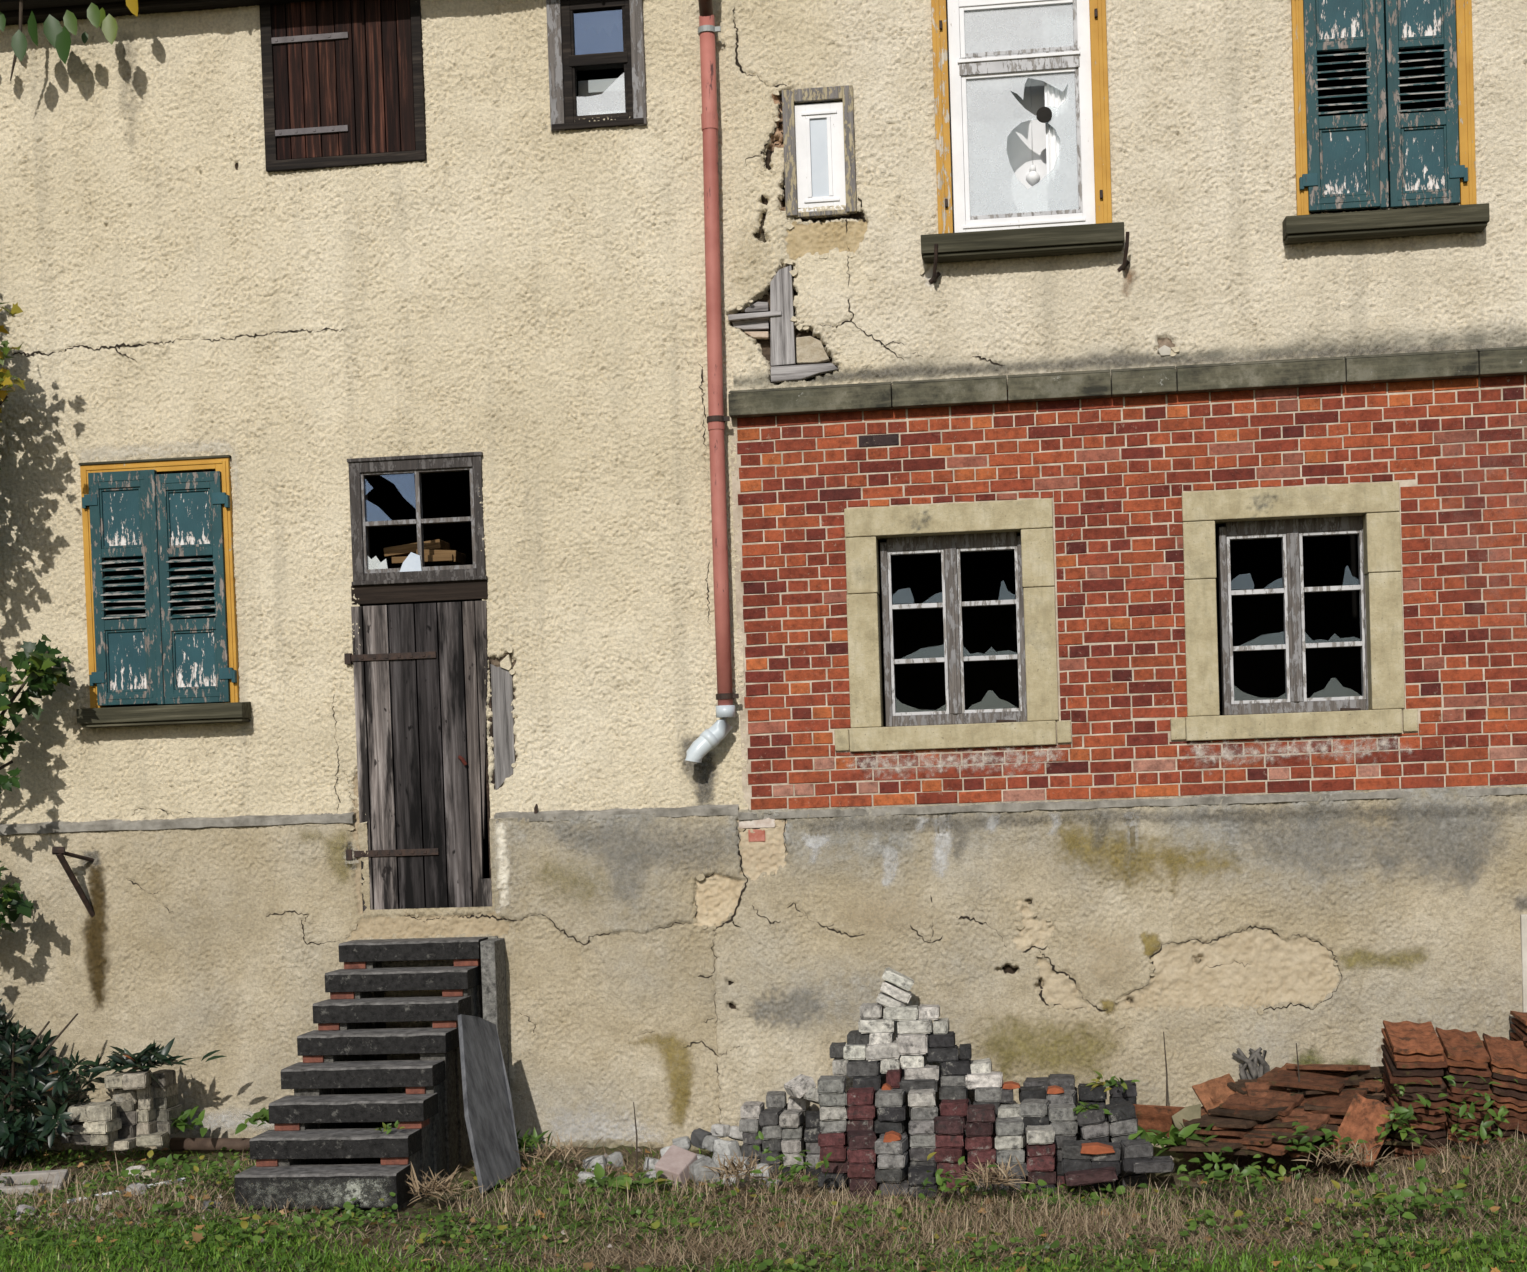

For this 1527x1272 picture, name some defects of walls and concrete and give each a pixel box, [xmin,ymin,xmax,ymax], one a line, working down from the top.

crack [732,8,787,166]
peeling [768,90,784,151]
spalling [728,186,868,385]
crack [9,327,347,361]
spalling [490,646,517,790]
crack [266,910,339,945]
crack [408,819,864,1123]
peeling [693,818,788,929]
leakage [806,806,1506,874]